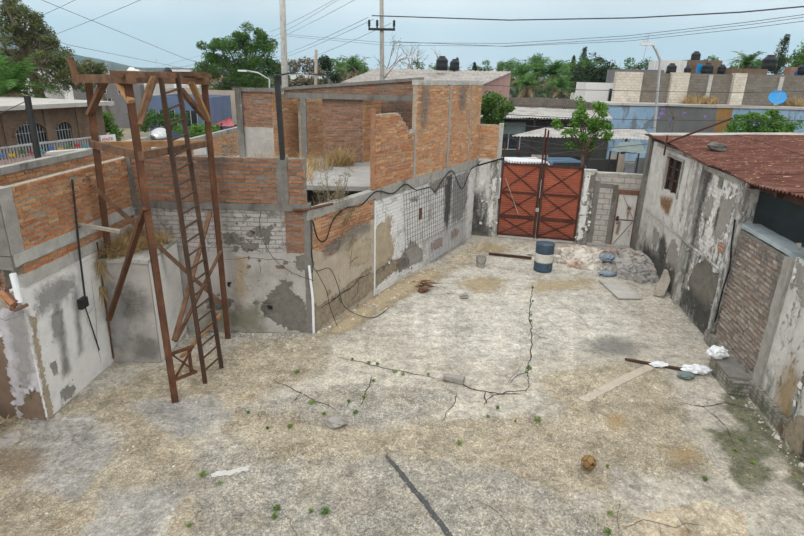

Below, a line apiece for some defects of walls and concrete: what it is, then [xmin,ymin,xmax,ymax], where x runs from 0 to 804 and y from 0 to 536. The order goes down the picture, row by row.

corrosion [661,197,672,214]
peeling [221,222,276,269]
crack [319,257,367,309]
peeling [253,214,459,333]
spalling [790,243,804,308]
peeling [0,310,78,420]
crack [273,357,438,407]
crack [442,288,588,421]
spalling [781,376,804,459]
crack [616,504,705,535]